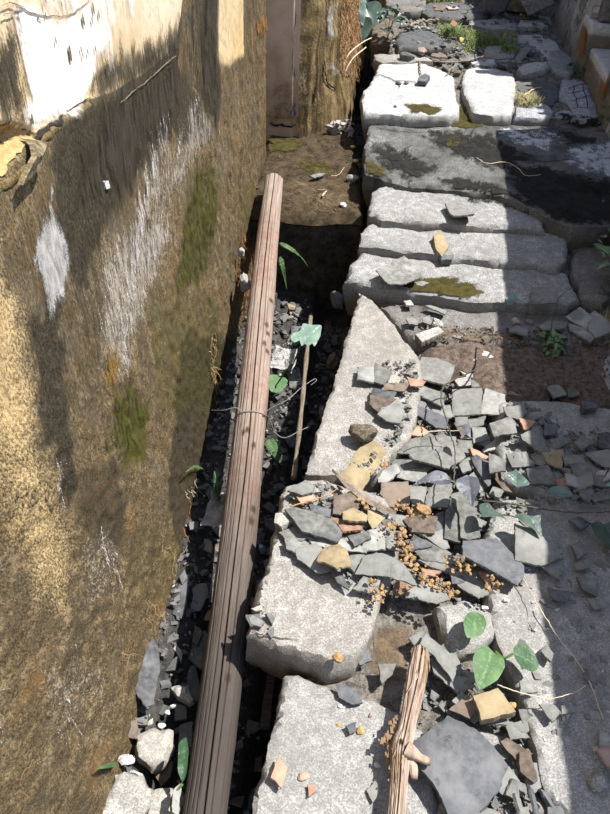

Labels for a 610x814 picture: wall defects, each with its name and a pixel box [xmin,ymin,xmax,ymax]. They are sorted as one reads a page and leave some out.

leakage [0,11,29,130]
peeling [0,0,114,193]
leakage [34,207,70,314]